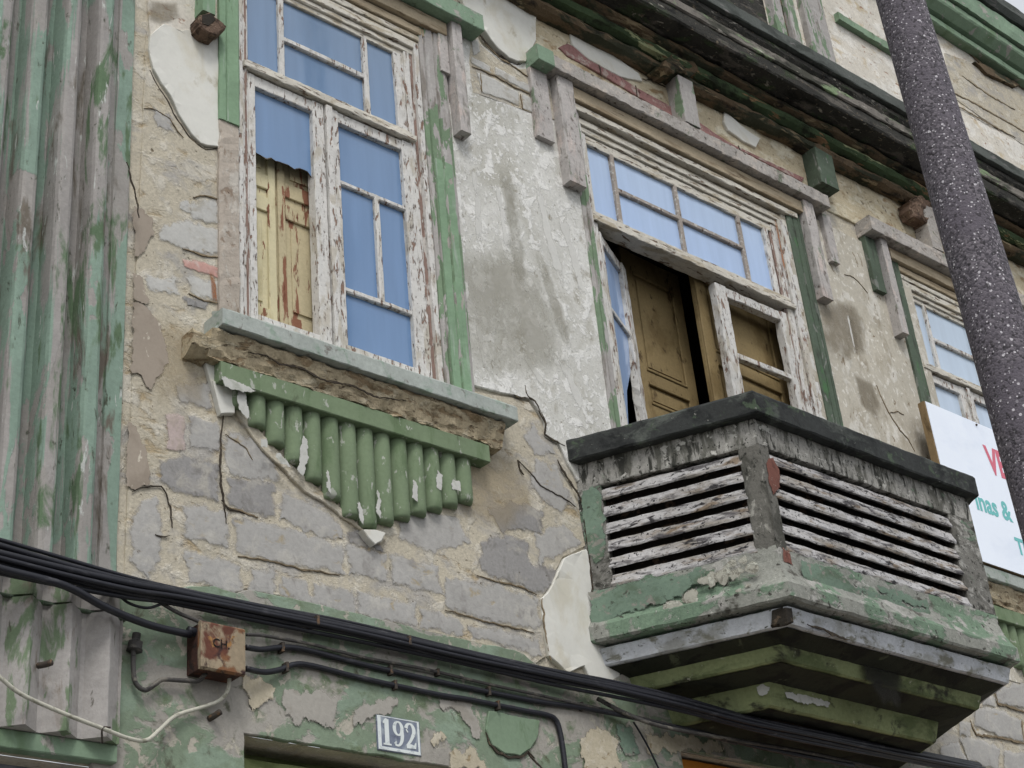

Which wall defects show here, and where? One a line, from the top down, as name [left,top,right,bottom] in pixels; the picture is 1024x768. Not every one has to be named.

spalling [124,0,606,663]
crack [132,485,173,537]
crack [219,416,253,524]
crack [514,385,594,592]
peeling [588,567,715,622]
spalling [771,607,794,628]
peeling [800,560,931,614]
peeling [353,696,398,726]
peeling [431,699,542,768]
peeling [580,724,724,768]
peeling [785,692,830,707]
spalling [924,669,1024,768]